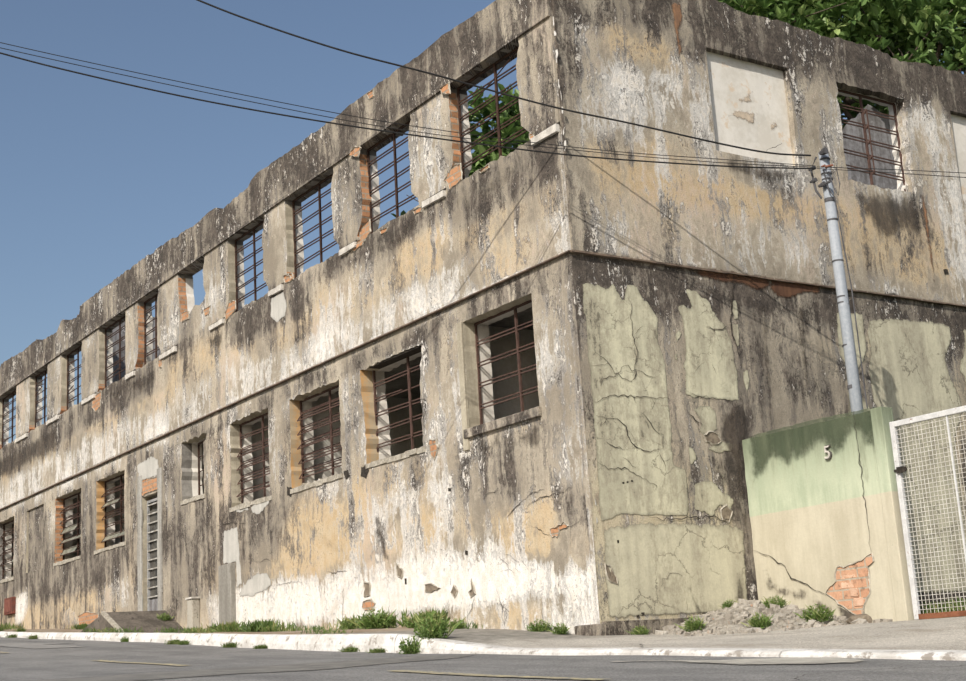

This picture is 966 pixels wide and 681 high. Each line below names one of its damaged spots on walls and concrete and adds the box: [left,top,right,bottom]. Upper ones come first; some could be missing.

water stain [729,161,790,179]
water stain [858,194,918,235]
crack [710,282,741,361]
crack [592,298,668,490]
water stain [0,430,55,476]
water stain [722,406,874,496]
spalling [550,521,569,538]
crack [652,515,739,524]
spalling [362,581,376,611]
spalling [425,578,476,599]
crack [757,551,824,594]
spalling [825,553,874,615]